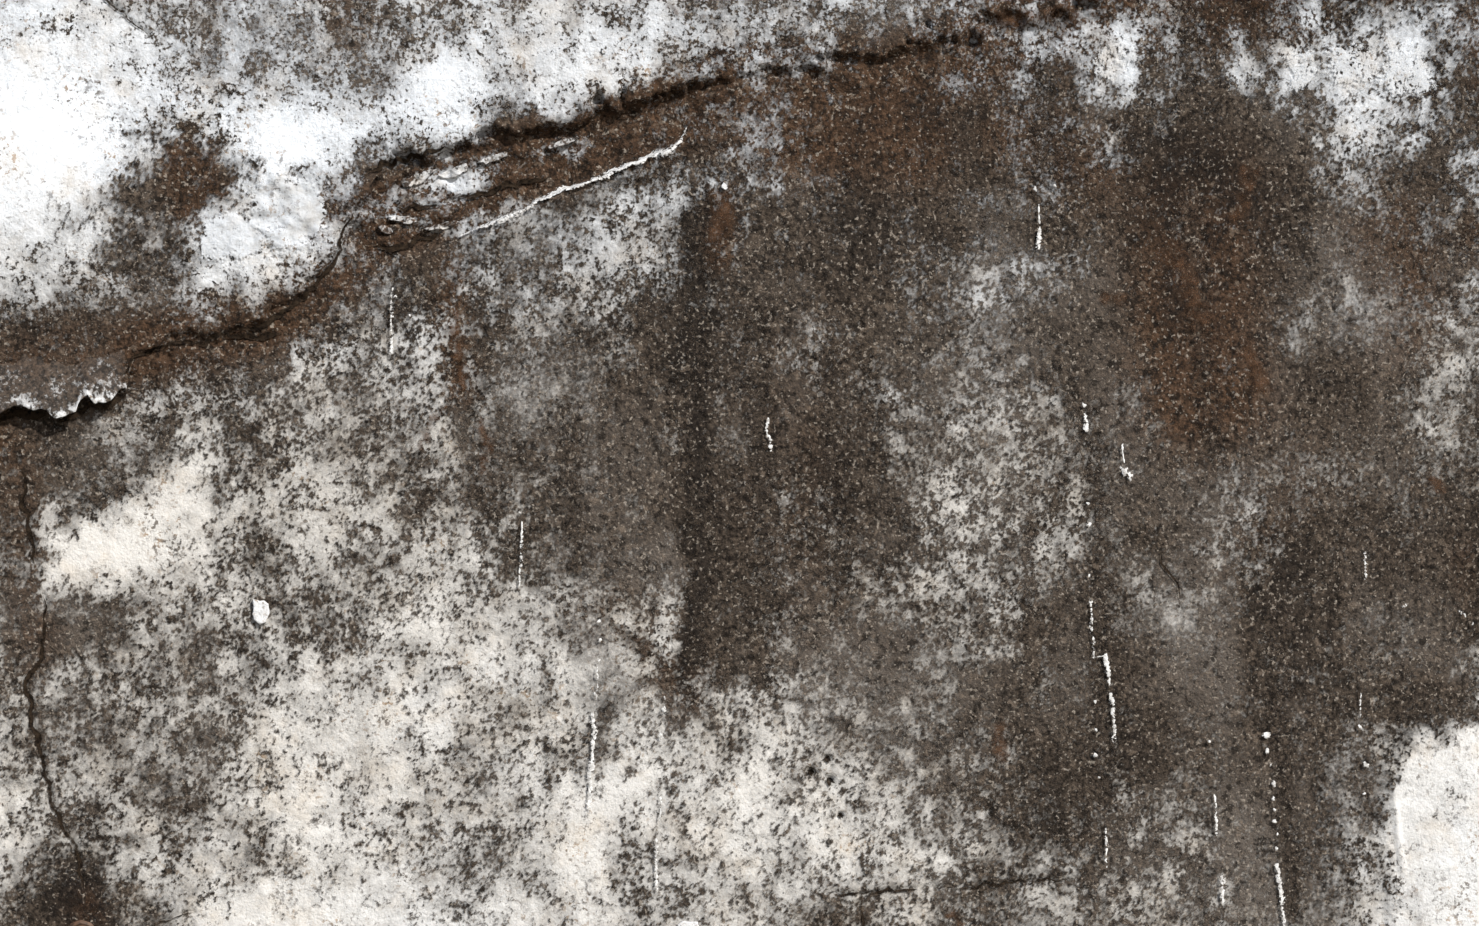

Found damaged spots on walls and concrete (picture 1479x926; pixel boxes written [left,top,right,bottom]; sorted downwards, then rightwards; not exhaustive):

damp [20,8,78,37]
crack [104,0,183,33]
flaking render [300,61,727,239]
crack [123,146,551,374]
peeling [0,349,127,422]
crack [20,469,84,889]
damp [313,751,342,791]
damp [309,839,353,906]